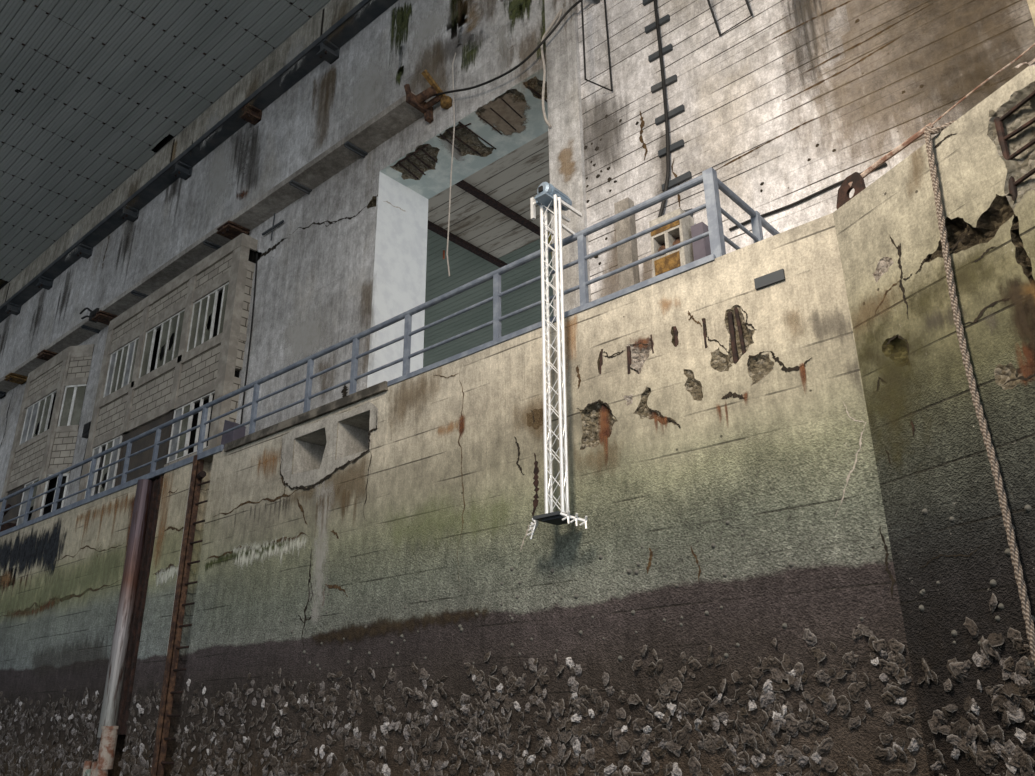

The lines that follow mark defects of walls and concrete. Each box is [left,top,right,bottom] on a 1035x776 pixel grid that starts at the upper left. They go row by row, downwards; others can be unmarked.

damp [389,4,412,66]
damp [509,0,531,33]
damp [945,58,1024,103]
peeling [389,76,547,180]
spalling [915,81,1035,286]
crack [259,201,405,259]
spalling [597,334,654,374]
spalling [702,304,774,386]
corrosion [1001,279,1035,352]
spalling [576,399,618,451]
spalling [624,386,681,428]
crack [205,411,377,646]